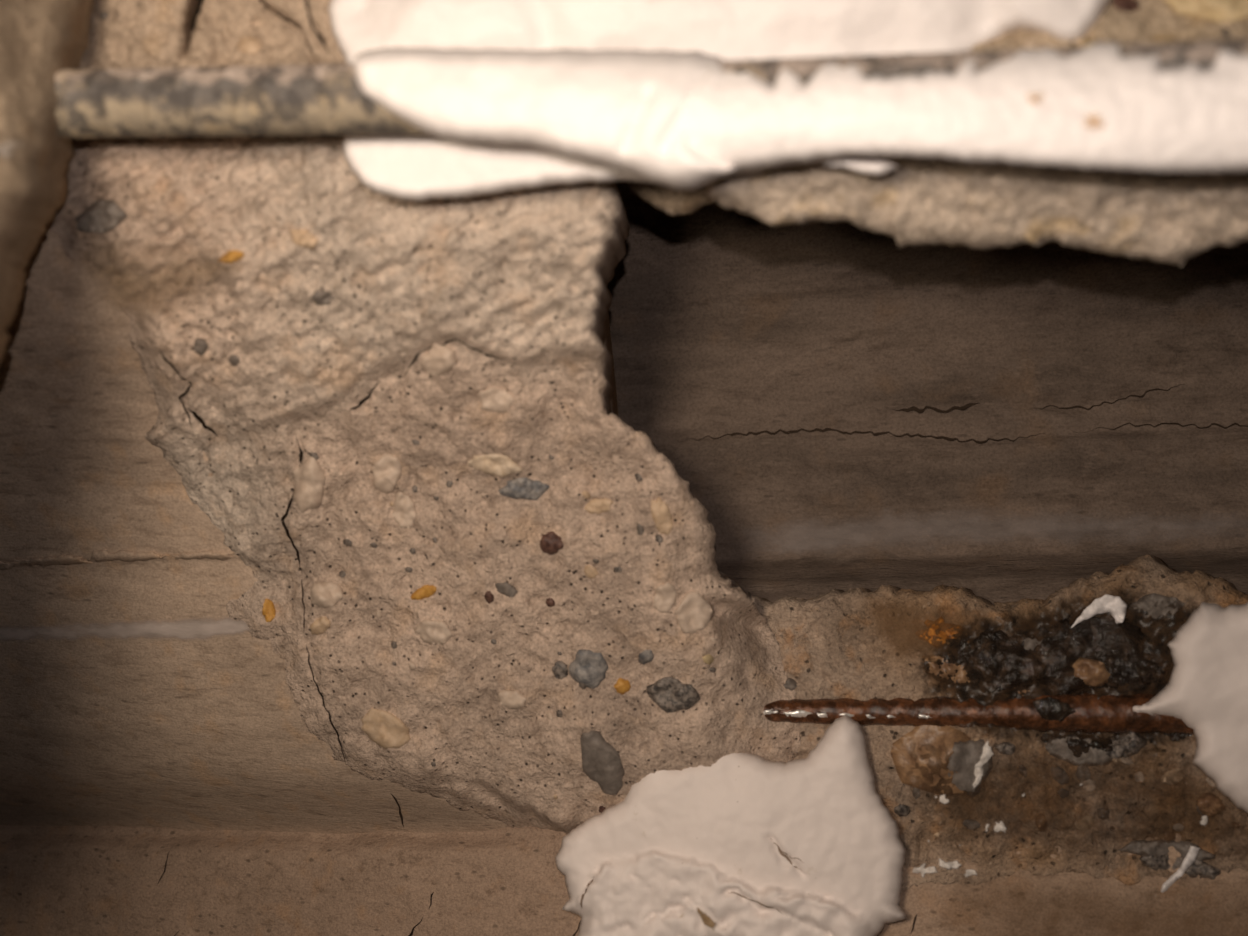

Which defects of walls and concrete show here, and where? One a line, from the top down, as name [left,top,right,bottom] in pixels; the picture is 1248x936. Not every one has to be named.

crack [259,0,329,62]
spalling [970,0,1248,51]
spalling [707,156,1248,267]
spalling [0,0,831,834]
crack [682,384,1248,444]
crack [281,432,346,765]
spalling [752,554,1248,701]
rust [897,592,1198,758]
spalling [861,725,1248,891]